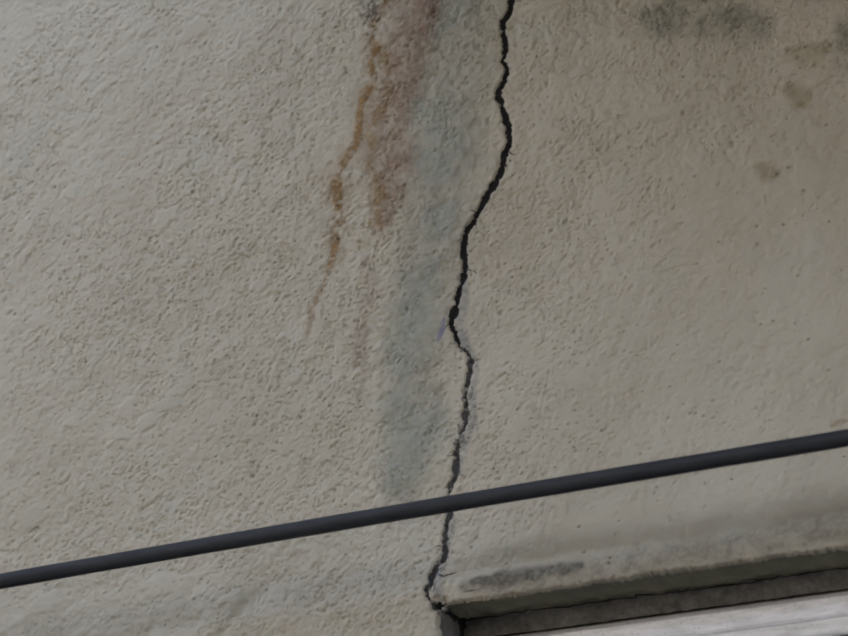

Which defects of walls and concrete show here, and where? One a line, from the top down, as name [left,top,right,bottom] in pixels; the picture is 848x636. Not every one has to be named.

crack [424,0,848,636]